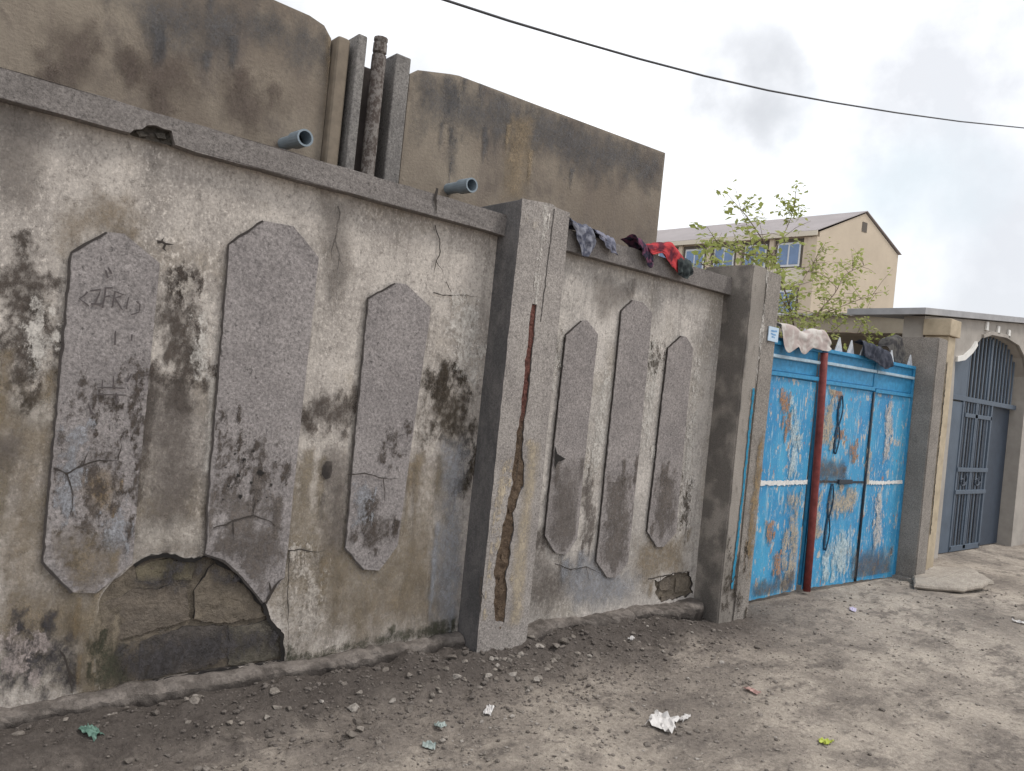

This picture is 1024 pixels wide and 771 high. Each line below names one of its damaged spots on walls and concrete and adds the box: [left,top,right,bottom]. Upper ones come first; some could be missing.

spalling [130,126,172,146]
damp [423,78,658,193]
crack [433,188,477,308]
crack [53,444,122,519]
damp [0,229,478,700]
crack [347,473,403,500]
crack [515,343,533,483]
peeling [781,395,804,592]
peeling [815,400,894,583]
flaking render [91,525,331,690]
crack [213,500,322,643]
flaking render [655,571,692,602]